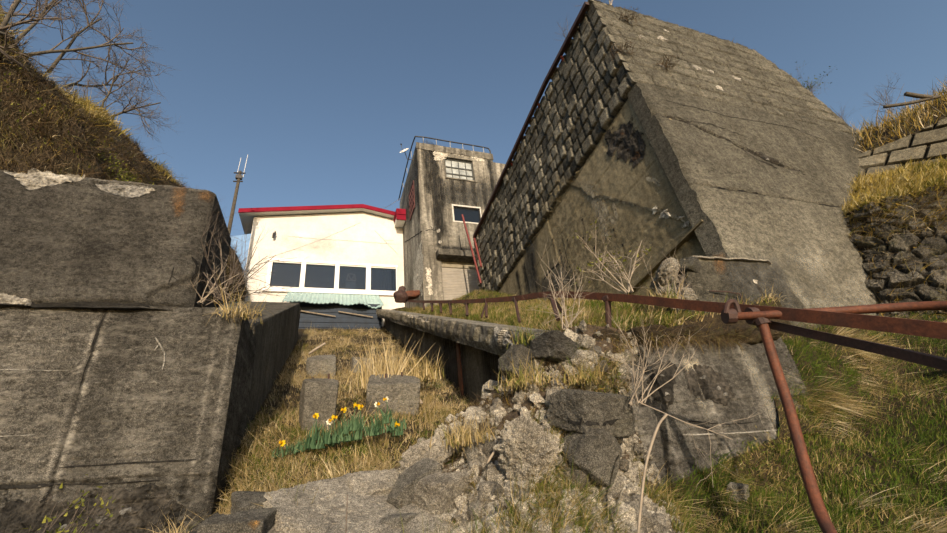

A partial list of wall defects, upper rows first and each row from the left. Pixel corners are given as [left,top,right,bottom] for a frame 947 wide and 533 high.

crack [652,99,837,175]
spalling [4,168,85,190]
spalling [95,183,156,198]
water stain [406,142,496,251]
crack [714,187,838,207]
spalling [0,292,32,306]